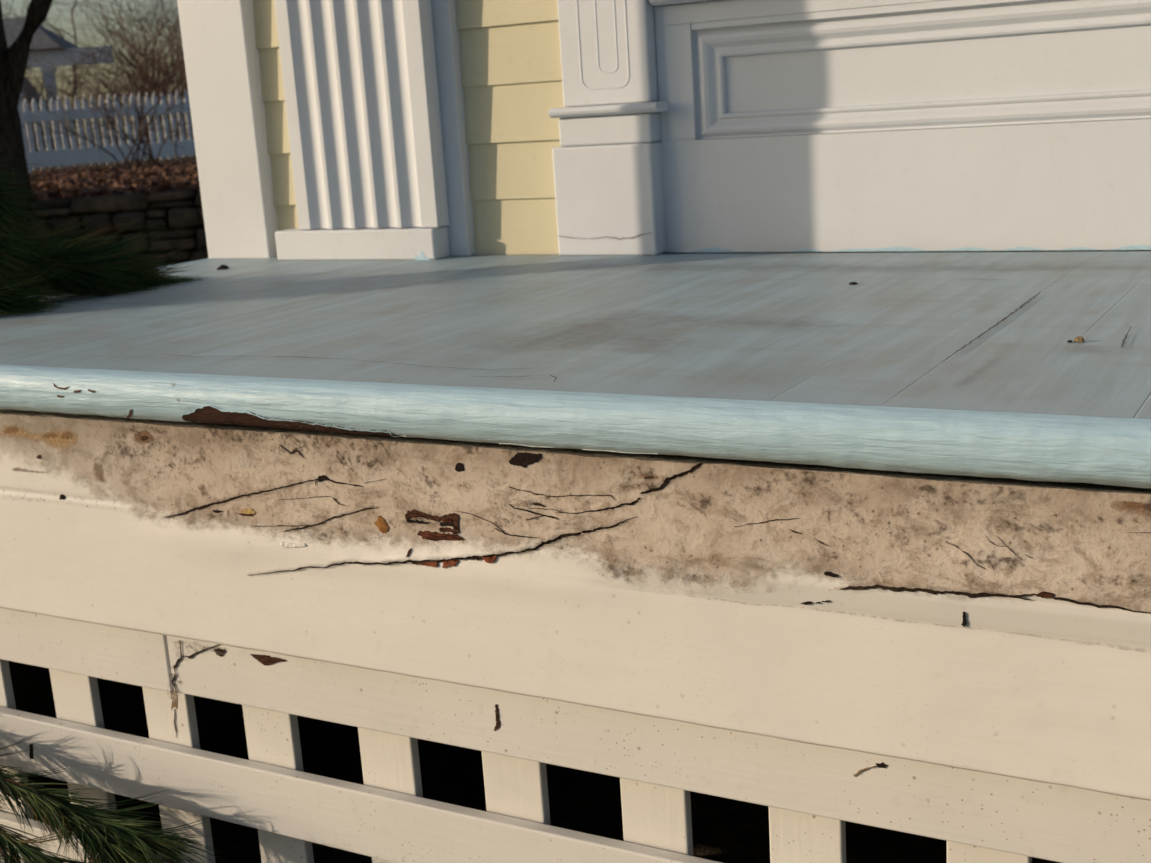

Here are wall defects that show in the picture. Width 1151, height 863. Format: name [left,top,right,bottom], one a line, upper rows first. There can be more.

peeling [239,508,256,516]
peeling [374,516,389,533]
peeling [442,555,497,568]
crack [247,463,702,576]
damp [25,415,1151,612]
crack [839,535,1151,614]
crack [170,640,220,738]
spalling [250,654,287,666]